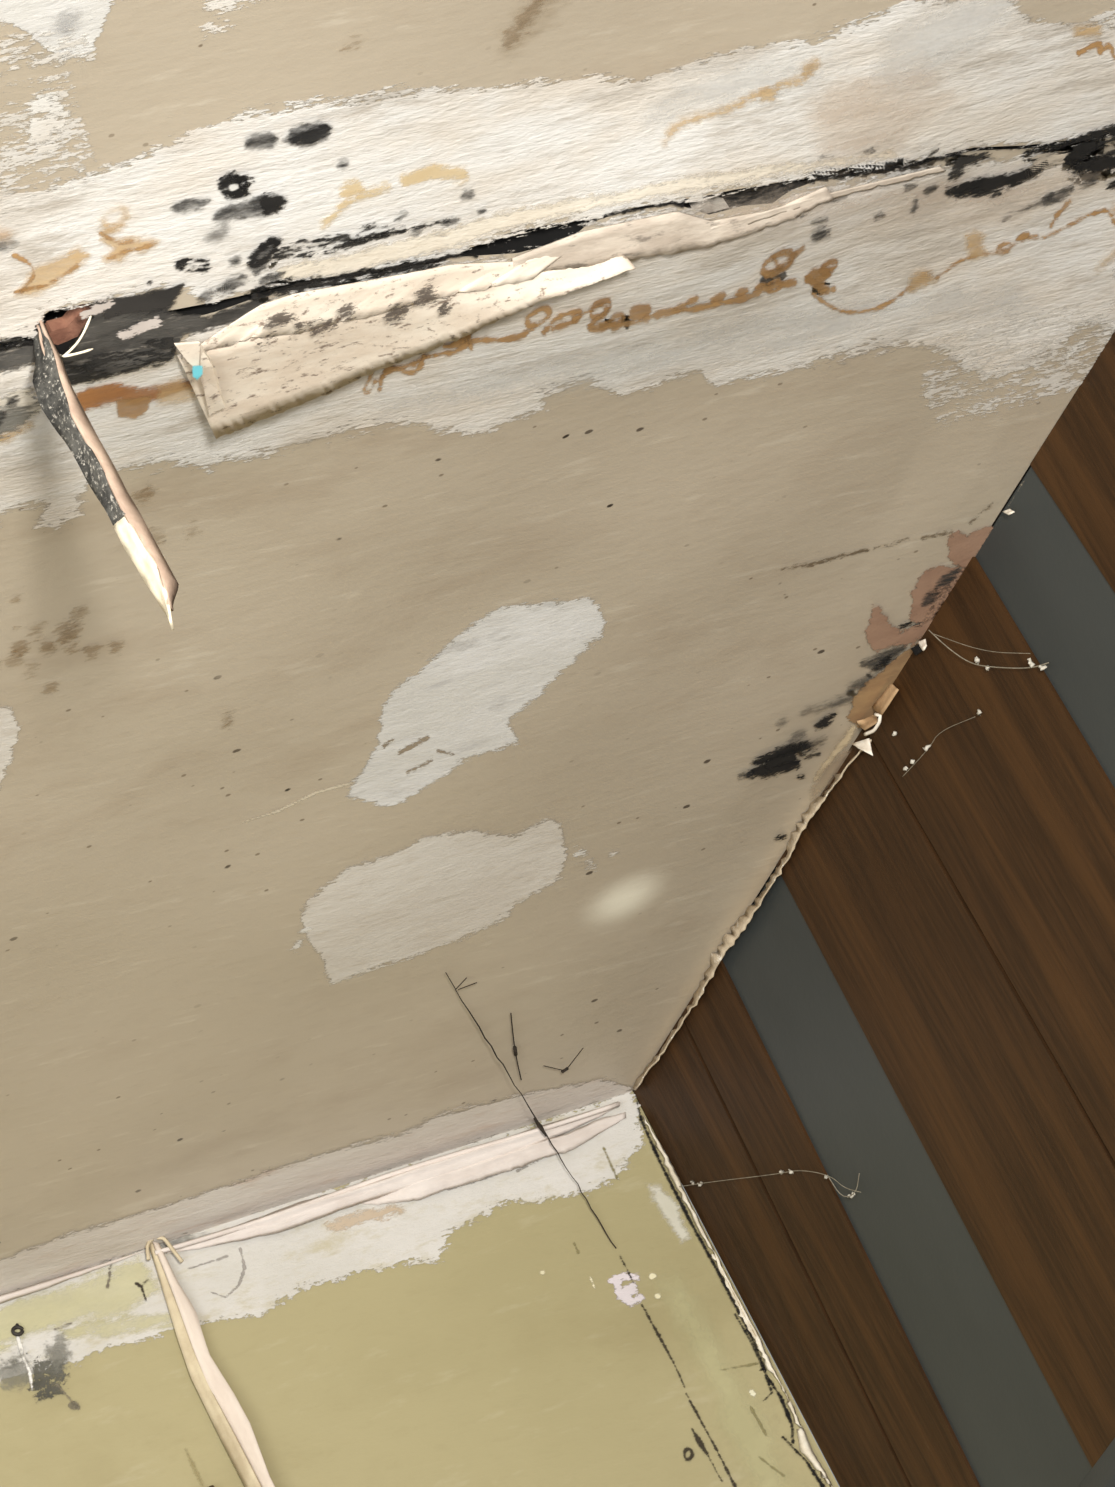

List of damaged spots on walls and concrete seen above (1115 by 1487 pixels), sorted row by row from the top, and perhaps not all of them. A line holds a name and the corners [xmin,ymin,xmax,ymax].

crack [257,143,1064,298]
crack [1,303,91,350]
peeling [0,387,41,438]
peeling [843,526,993,756]